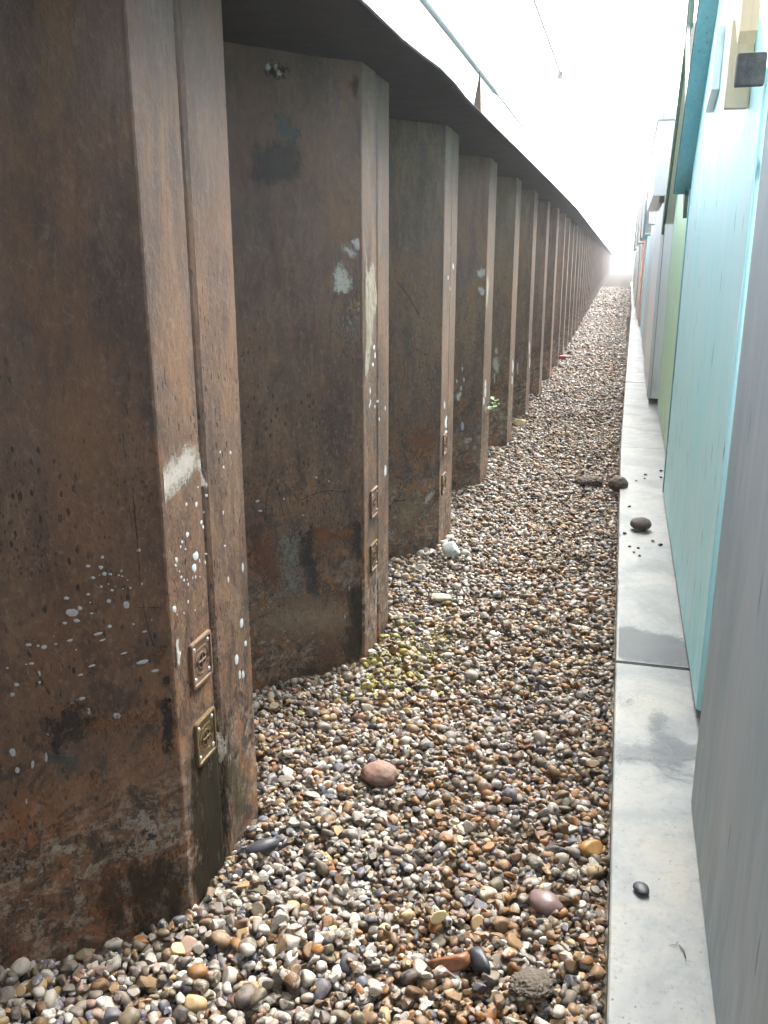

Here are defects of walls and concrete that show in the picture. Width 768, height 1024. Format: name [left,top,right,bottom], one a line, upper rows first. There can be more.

damp [40,698,95,755]
damp [156,676,174,754]
damp [101,707,238,933]